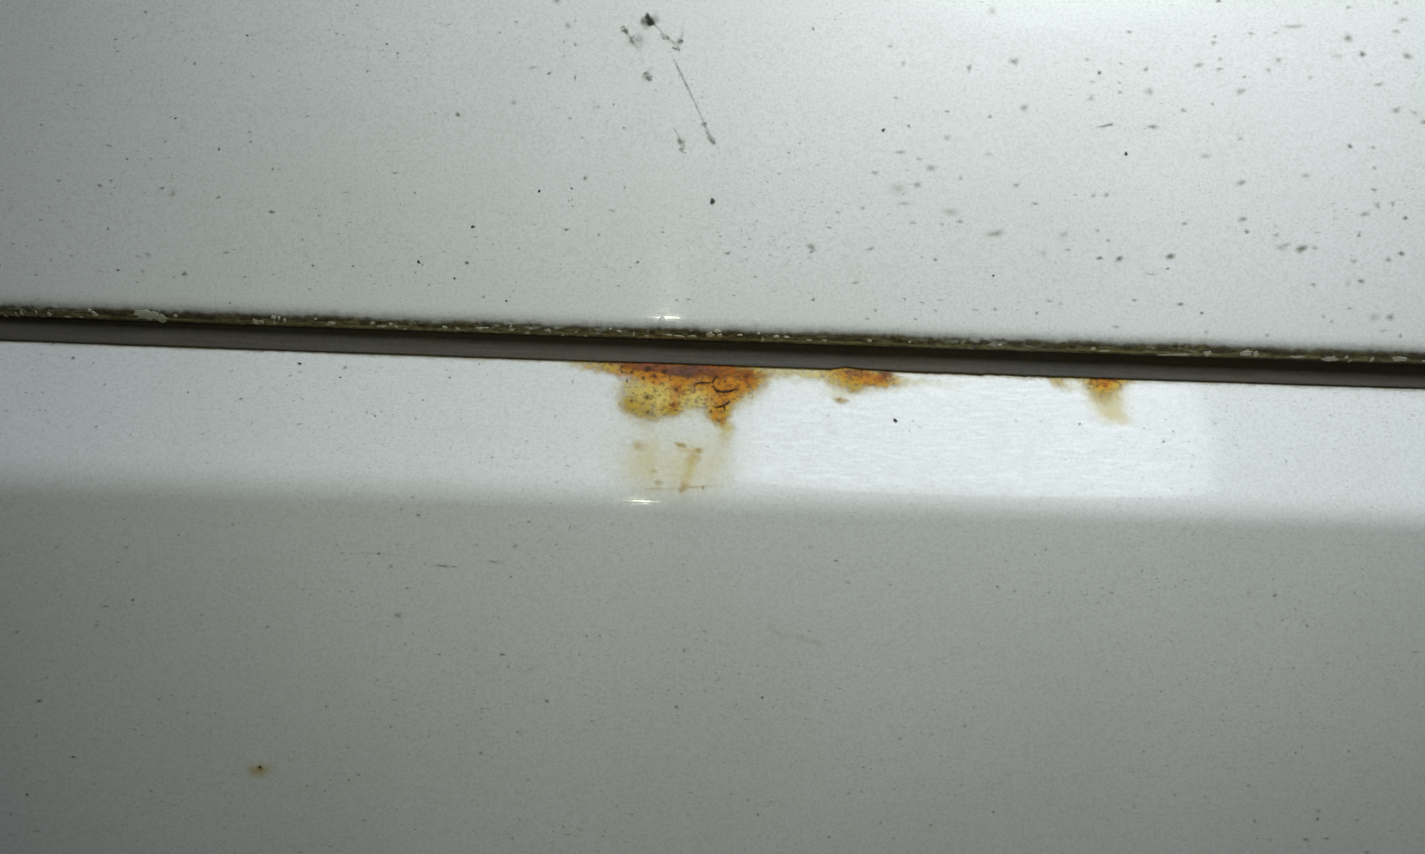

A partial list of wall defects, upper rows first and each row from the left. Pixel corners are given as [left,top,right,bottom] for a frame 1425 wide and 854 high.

corrosion [582,361,769,431]
corrosion [800,367,901,402]
corrosion [1083,377,1128,415]